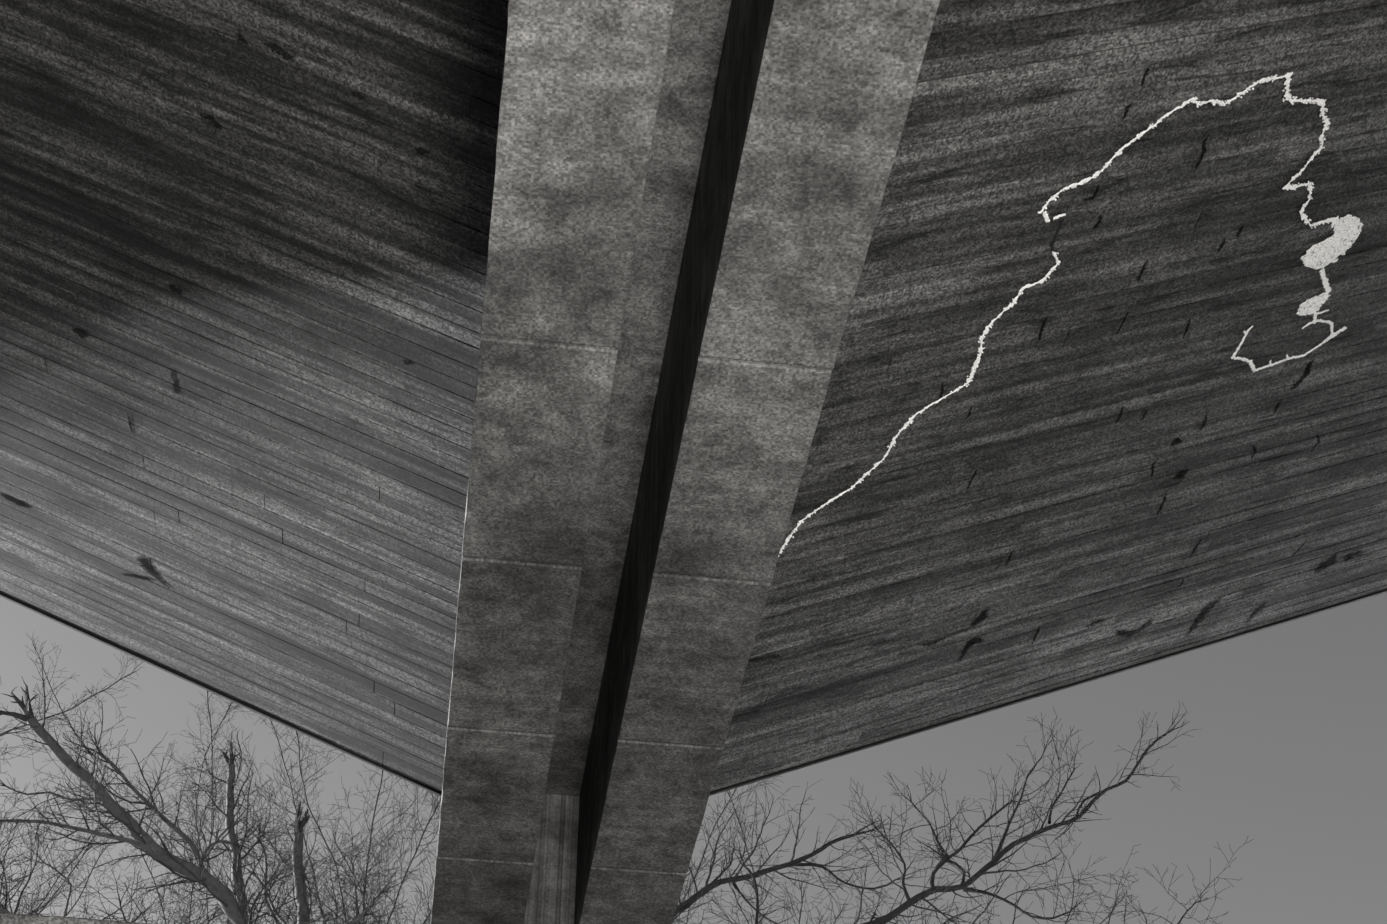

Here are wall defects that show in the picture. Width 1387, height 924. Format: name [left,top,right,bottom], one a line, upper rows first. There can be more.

crack [778,68,1363,557]
crack [1176,539,1202,589]